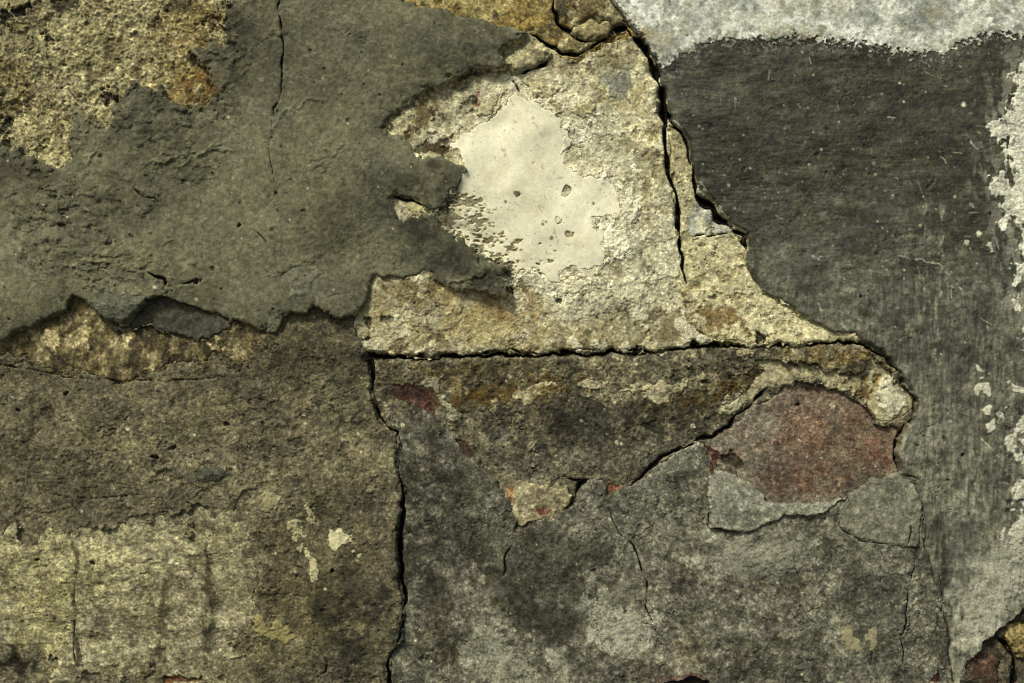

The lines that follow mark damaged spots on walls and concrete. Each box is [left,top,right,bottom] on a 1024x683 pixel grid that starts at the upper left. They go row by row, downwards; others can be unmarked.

spalling [0,0,231,169]
crack [268,0,284,202]
crack [504,2,746,284]
spalling [0,296,274,384]
crack [365,344,739,683]
spalling [353,0,915,537]
crack [629,388,770,486]